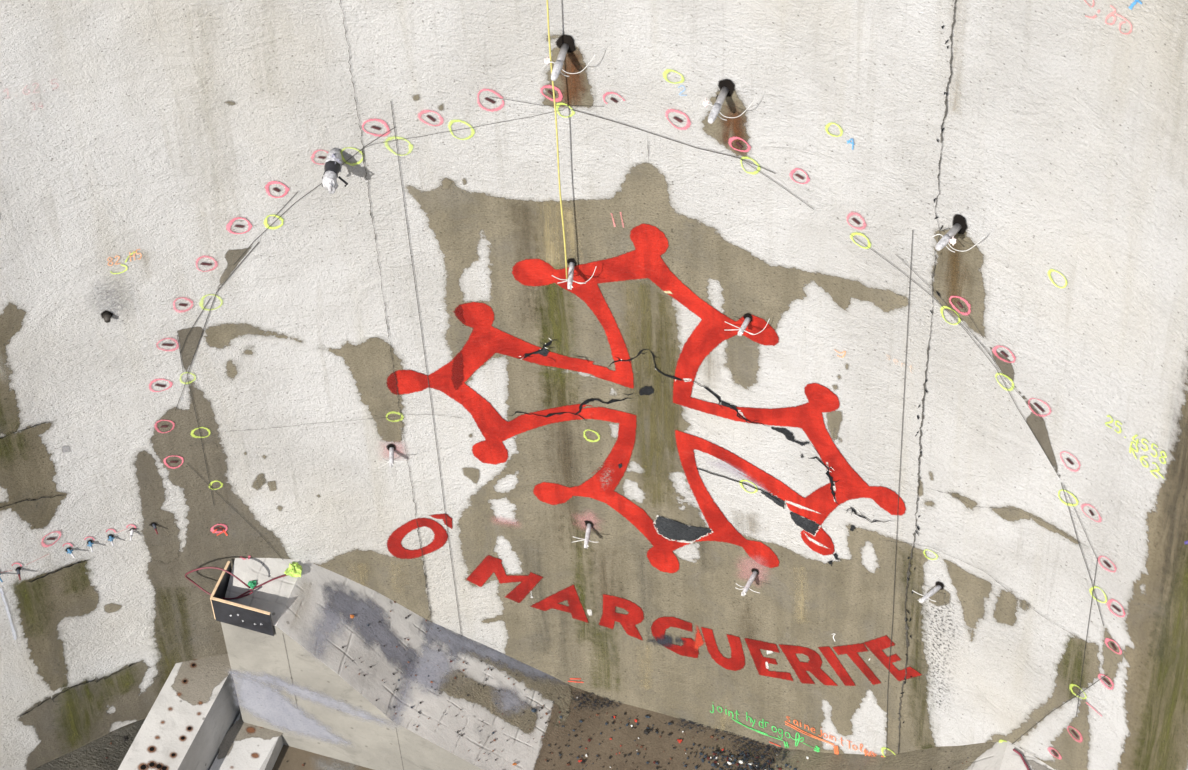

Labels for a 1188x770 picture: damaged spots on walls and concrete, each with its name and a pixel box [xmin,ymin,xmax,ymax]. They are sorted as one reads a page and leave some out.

crack [508,339,770,427]
spalling [639,386,654,396]
leakage [14,163,1188,770]
crack [697,468,780,502]
spalling [771,427,809,458]
spalling [653,515,713,543]
spalling [760,492,839,565]
crack [809,443,1081,639]